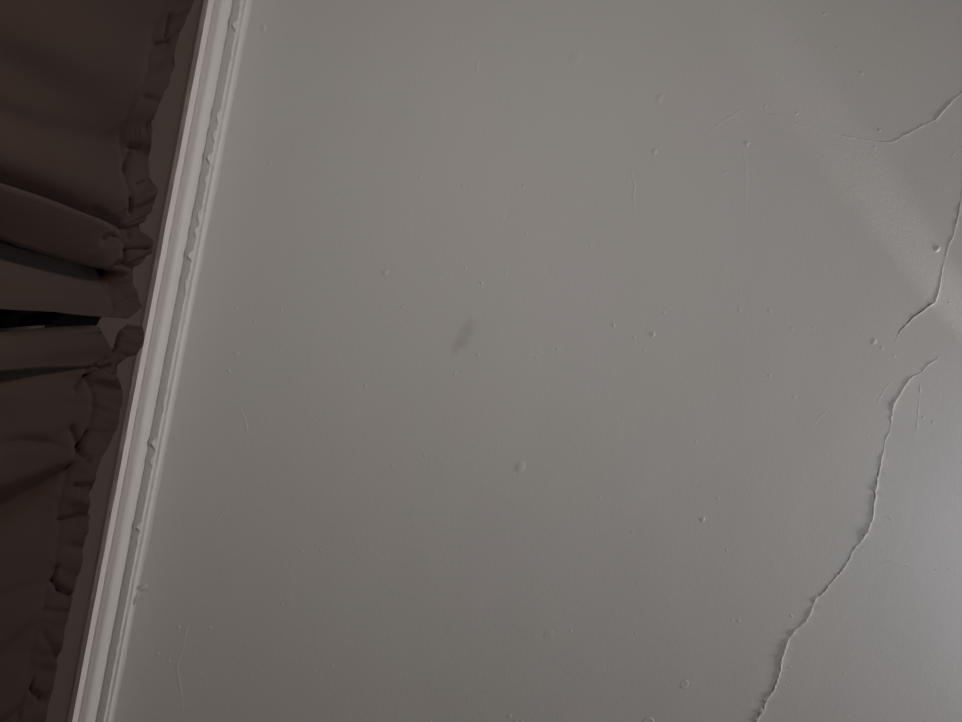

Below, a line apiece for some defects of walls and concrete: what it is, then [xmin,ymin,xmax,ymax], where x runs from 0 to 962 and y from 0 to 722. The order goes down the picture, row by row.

crack [753,191,962,722]